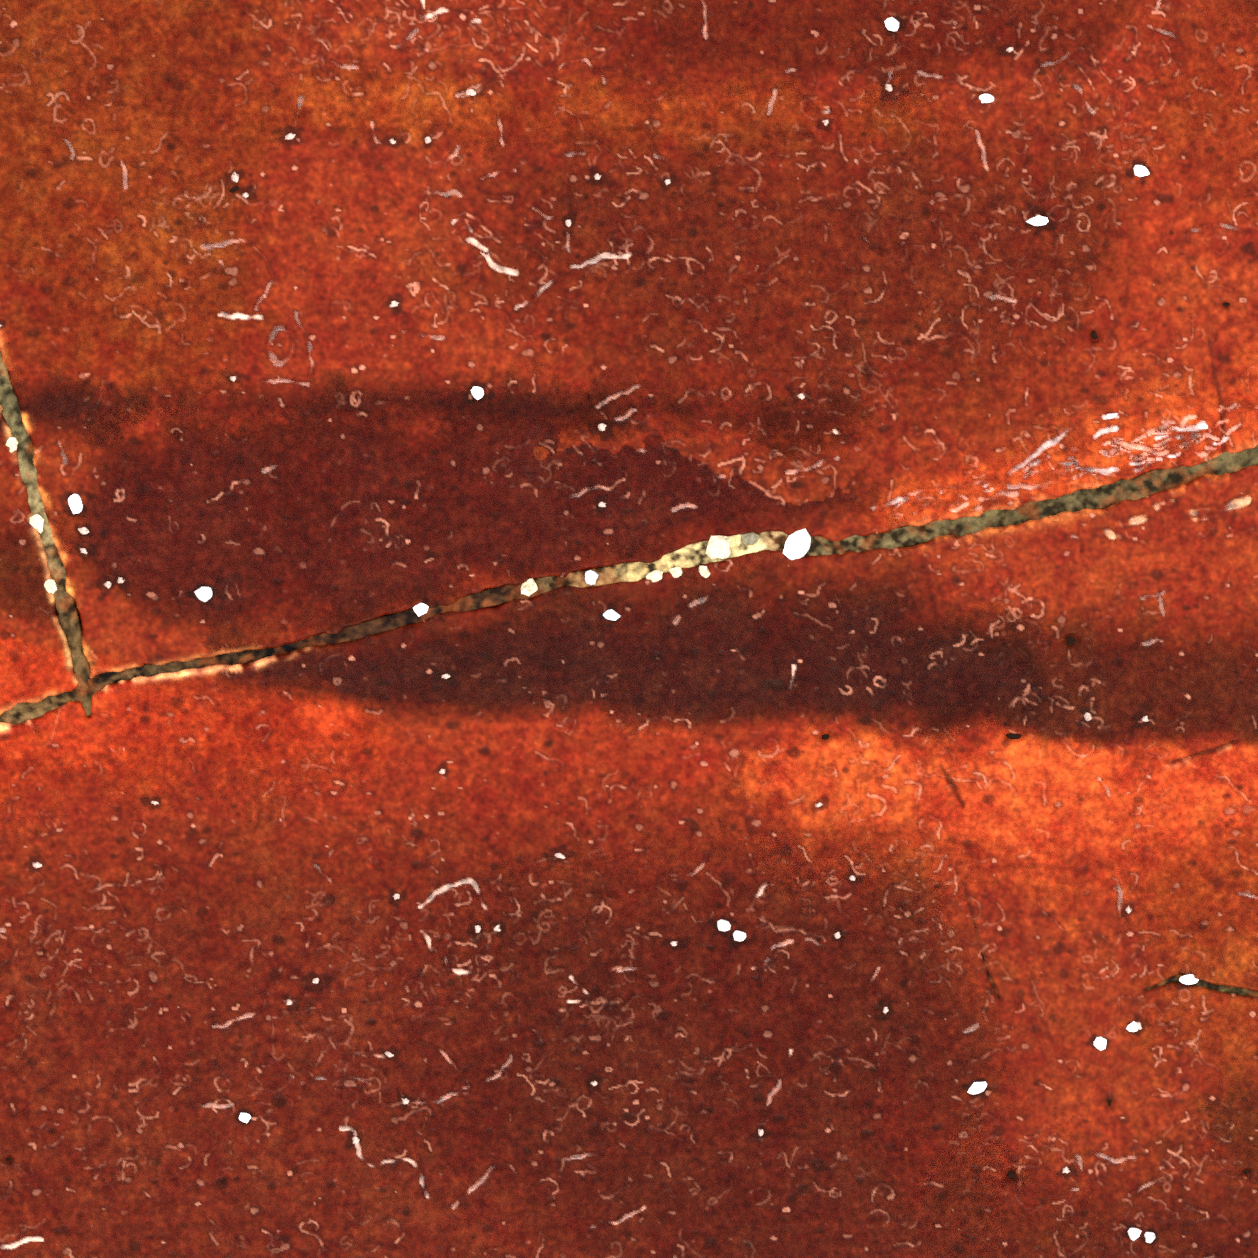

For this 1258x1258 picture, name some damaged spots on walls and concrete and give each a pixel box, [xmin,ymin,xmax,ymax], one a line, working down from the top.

rust [0,0,241,376]
rust [241,76,823,148]
rust [857,105,919,140]
rust [869,354,1258,526]
crack [0,337,1258,731]
rust [0,630,370,774]
rust [739,730,1258,1071]